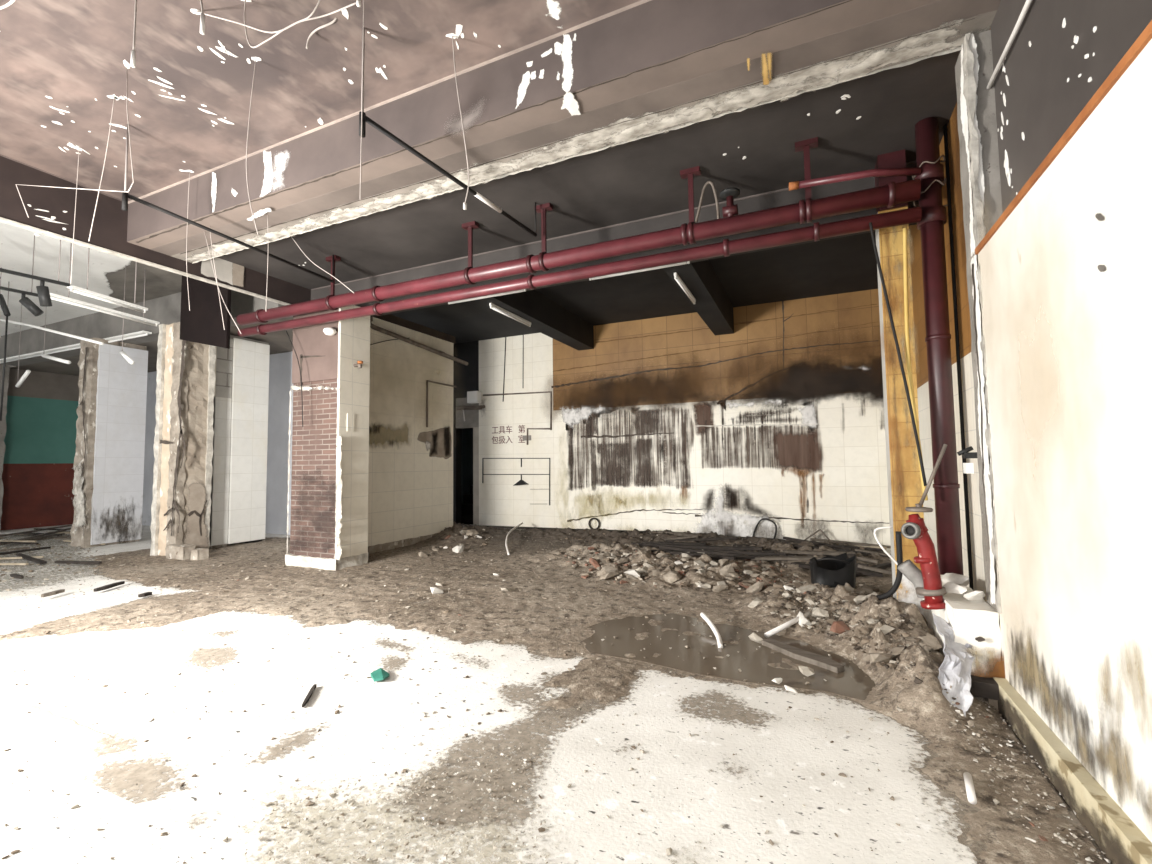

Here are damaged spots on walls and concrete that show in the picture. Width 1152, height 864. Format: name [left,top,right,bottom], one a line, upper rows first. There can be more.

peeling [149,68,185,101]
peeling [516,0,581,116]
peeling [105,261,182,304]
spalling [184,19,1002,616]
leakage [558,363,822,509]
spalling [72,463,85,532]
mould [100,506,137,544]
corrosion [782,468,822,527]
leakage [998,635,1133,864]